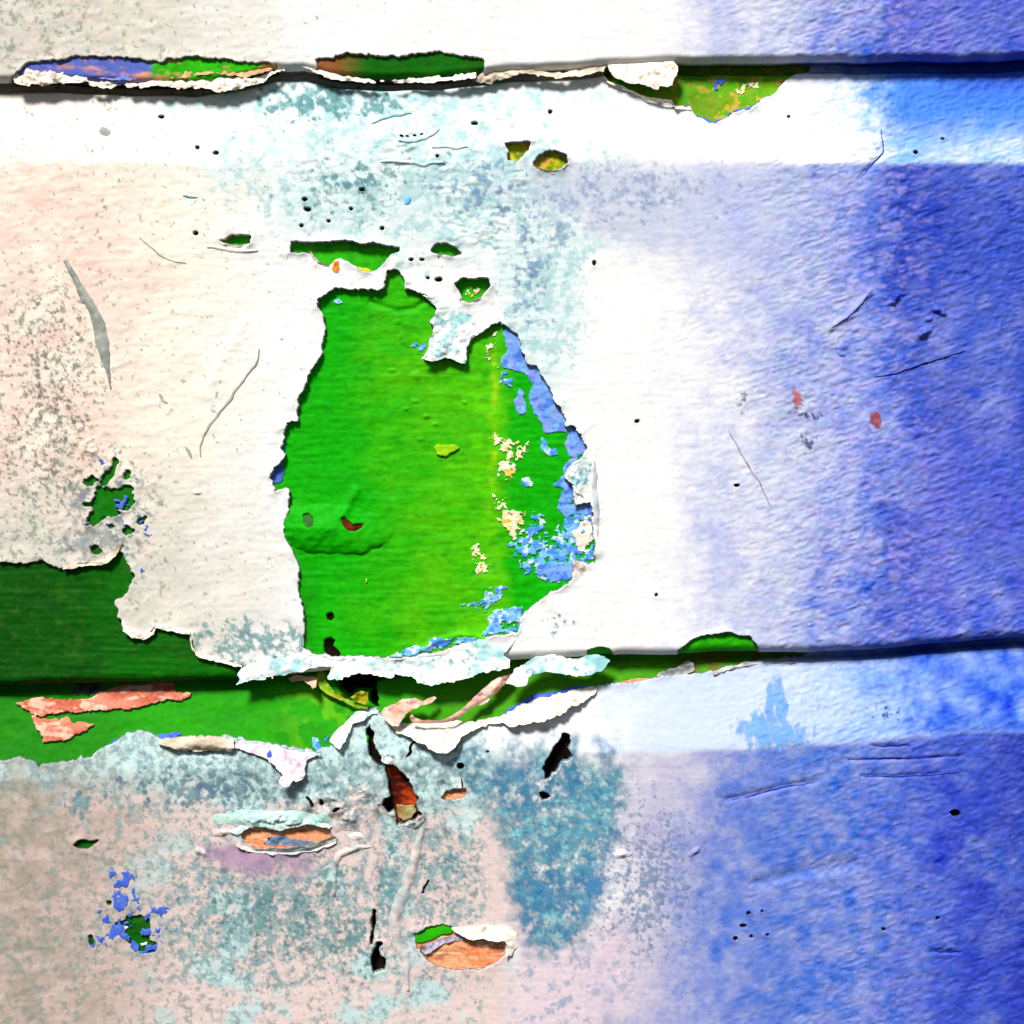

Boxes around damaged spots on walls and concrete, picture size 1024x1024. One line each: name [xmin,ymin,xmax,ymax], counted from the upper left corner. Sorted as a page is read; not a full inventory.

peeling [12,56,285,93]
peeling [302,52,810,124]
peeling [506,143,569,174]
peeling [0,242,805,788]
peeling [86,868,169,954]